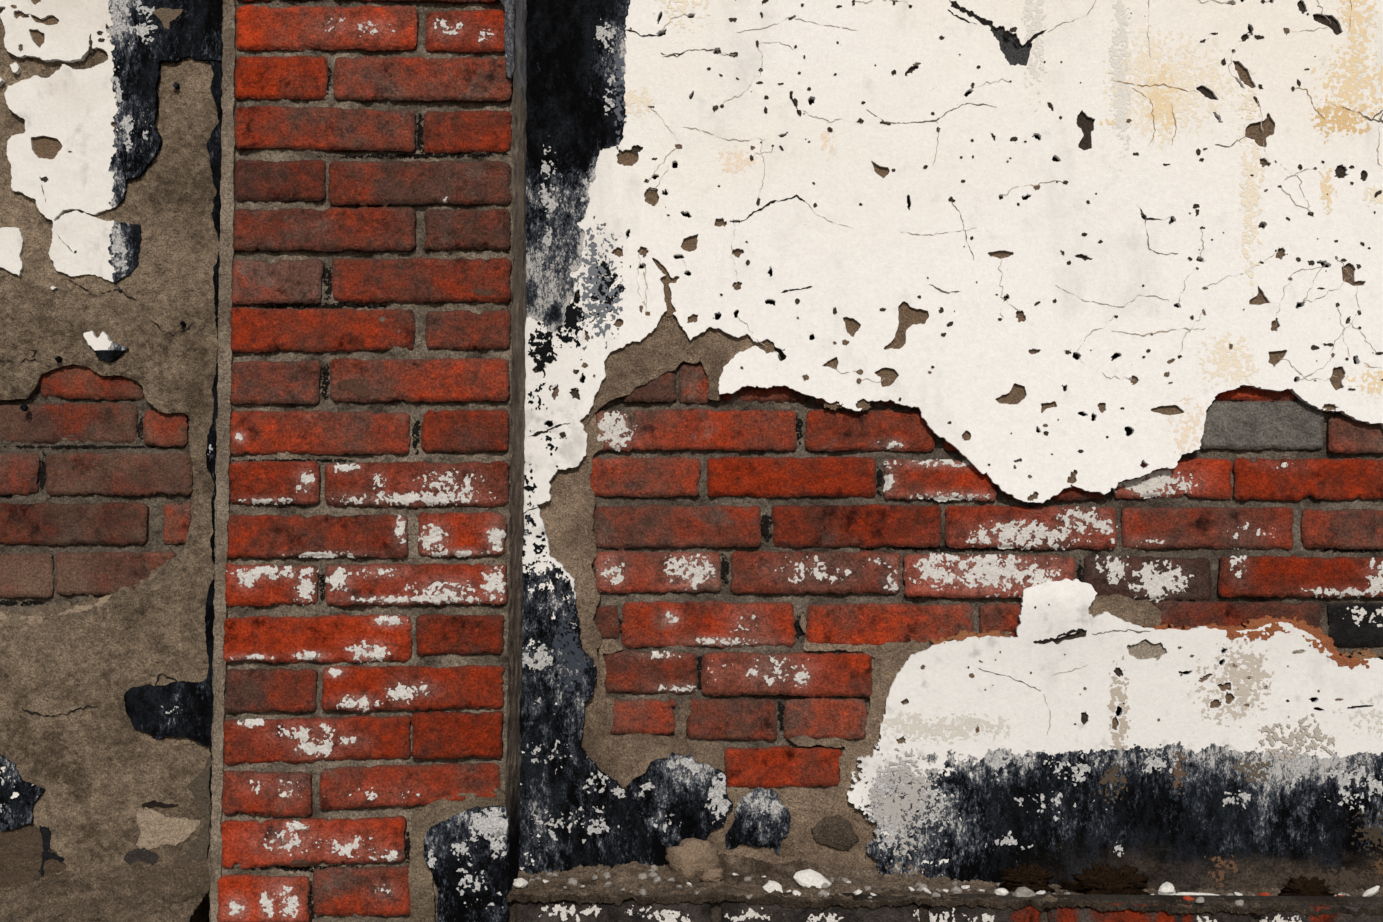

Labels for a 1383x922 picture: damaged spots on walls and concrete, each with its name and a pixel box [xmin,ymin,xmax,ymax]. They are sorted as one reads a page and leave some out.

crack [627,0,909,359]
crack [790,79,1009,163]
peeling [989,22,1032,66]
crack [949,1,1096,45]
crack [1056,209,1380,381]
spalling [0,365,213,625]
efflorescence [226,462,506,626]
spalling [217,0,553,922]
spalling [527,247,1383,893]
leakage [1301,557,1383,627]
efflorescence [237,718,356,758]
efflorescence [264,820,398,862]